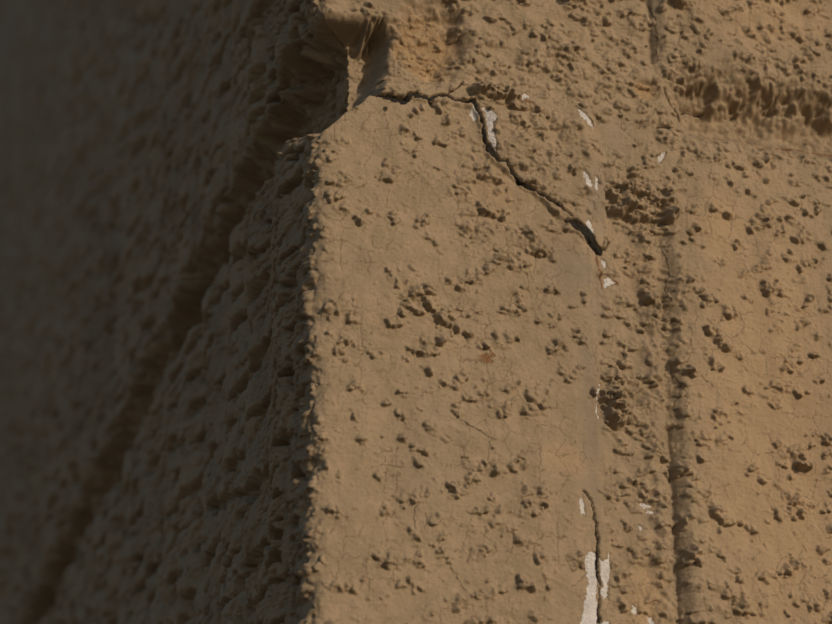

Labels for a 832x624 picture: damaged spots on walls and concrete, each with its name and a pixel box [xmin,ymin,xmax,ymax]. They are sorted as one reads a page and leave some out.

peeling [470,105,497,151]
crack [575,97,637,144]
crack [377,84,605,255]
crack [582,491,601,623]
peeling [580,551,610,624]